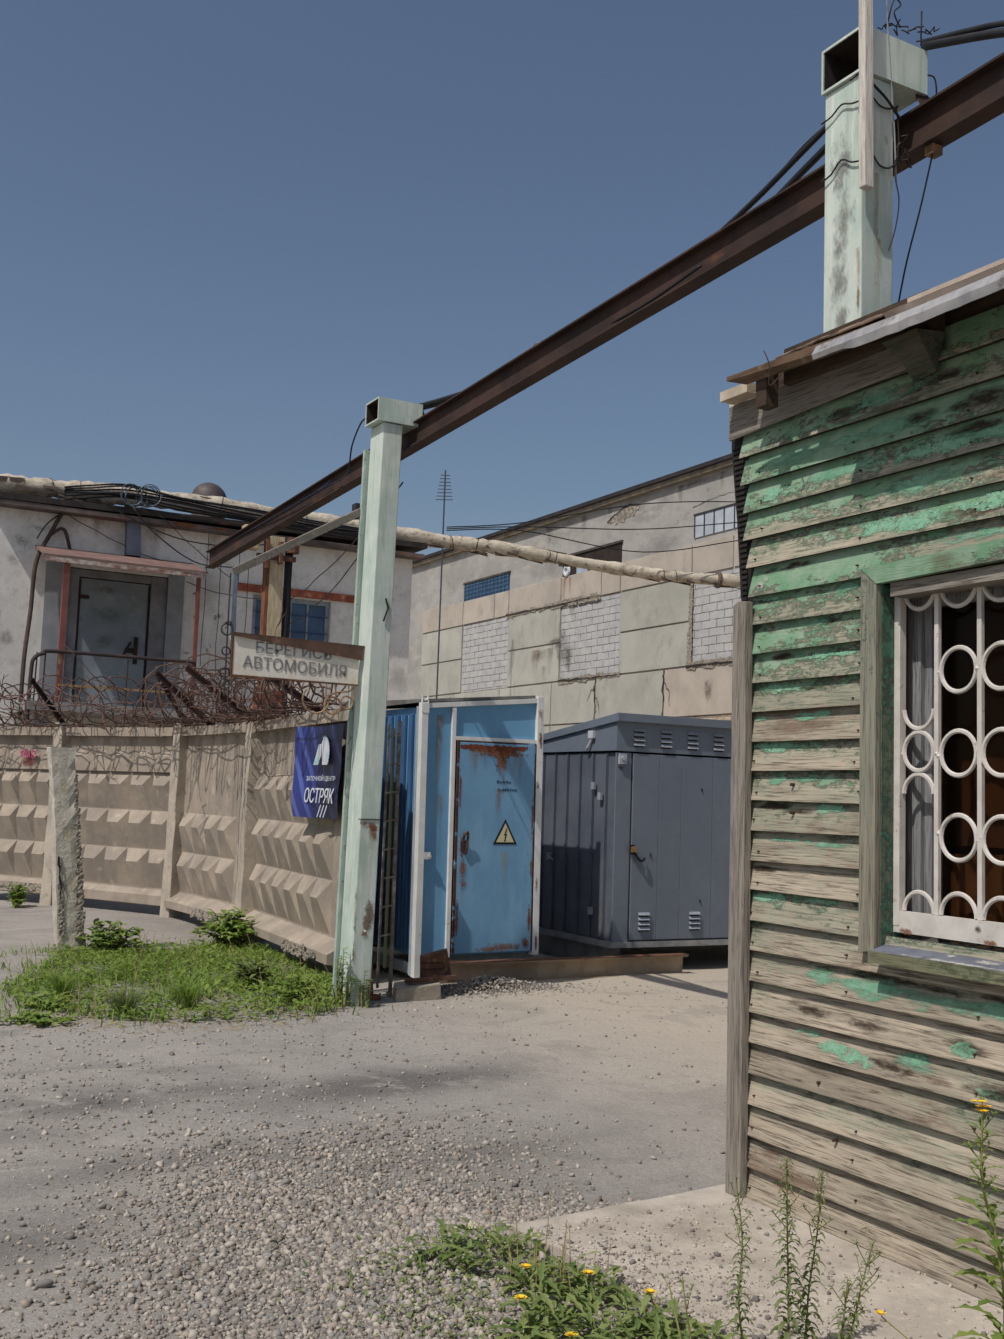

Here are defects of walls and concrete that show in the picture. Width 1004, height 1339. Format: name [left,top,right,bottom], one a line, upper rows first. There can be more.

peeling [809,423,1004,497]
peeling [759,485,790,503]
peeling [855,491,1004,544]
peeling [773,650,857,660]
corrosion [461,734,542,770]
peeling [752,741,805,753]
peeling [761,802,846,813]
peeling [751,891,840,905]
peeling [931,955,1002,971]
peeling [807,966,1004,1020]
peeling [797,1028,875,1069]
peeling [898,1053,930,1072]